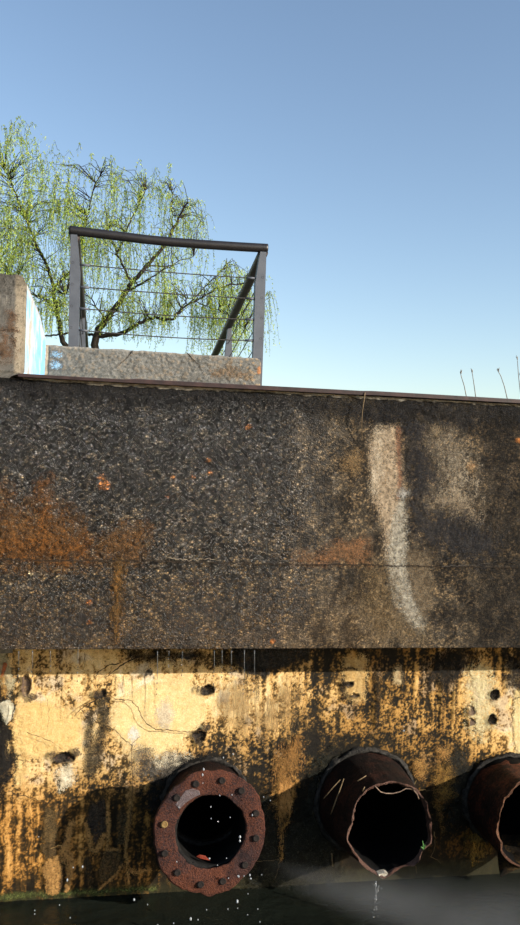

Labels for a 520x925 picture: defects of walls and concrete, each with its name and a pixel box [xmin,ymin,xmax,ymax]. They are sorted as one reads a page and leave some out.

damp [3,377,520,733]
damp [82,695,112,781]
crack [3,649,250,823]
damp [119,648,315,818]
crack [2,791,52,859]
damp [40,805,67,890]
damp [81,797,131,888]
damp [242,744,348,889]
damp [439,740,473,832]